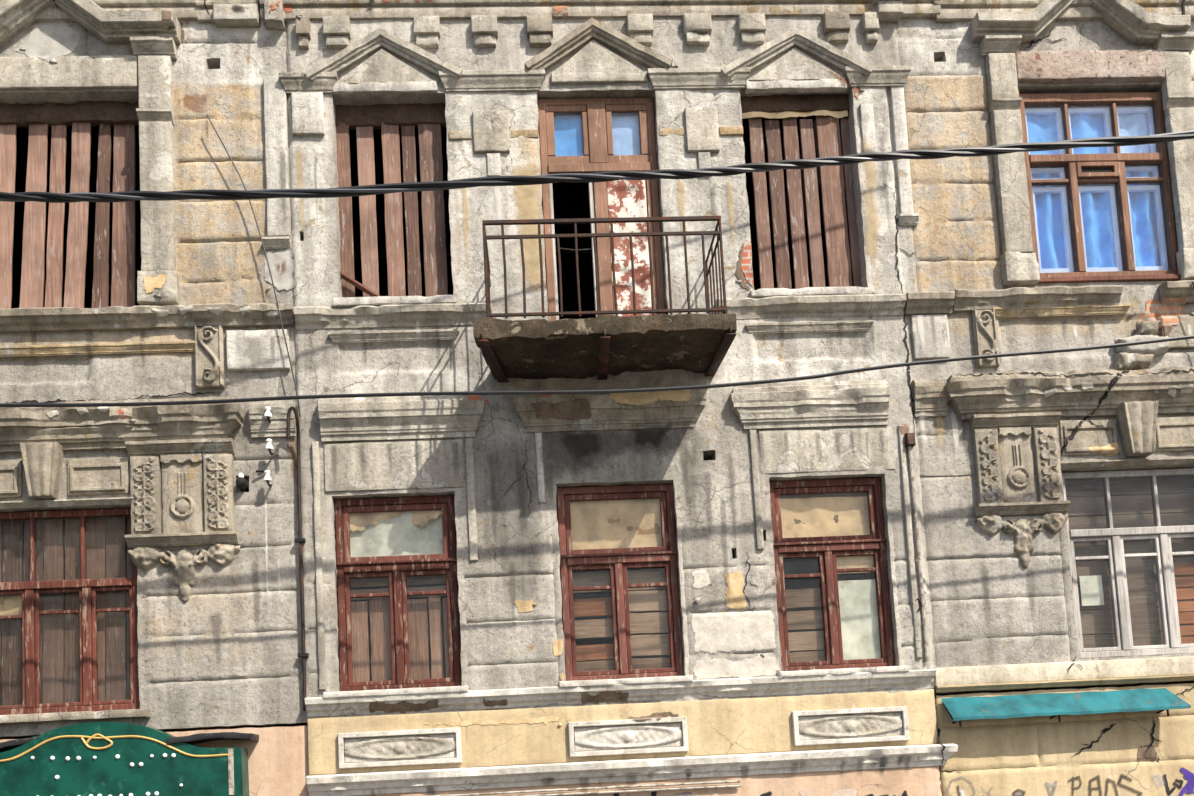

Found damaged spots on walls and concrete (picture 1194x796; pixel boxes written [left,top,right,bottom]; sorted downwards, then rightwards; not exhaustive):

flaking render [269,1,302,19]
flaking render [735,241,754,290]
crack [894,186,916,442]
crack [956,368,1194,460]
damp [548,424,689,469]
flaking render [691,569,785,680]
peeling [368,699,569,727]
peeling [580,692,679,722]
crack [1071,724,1115,758]
crack [1146,719,1162,752]